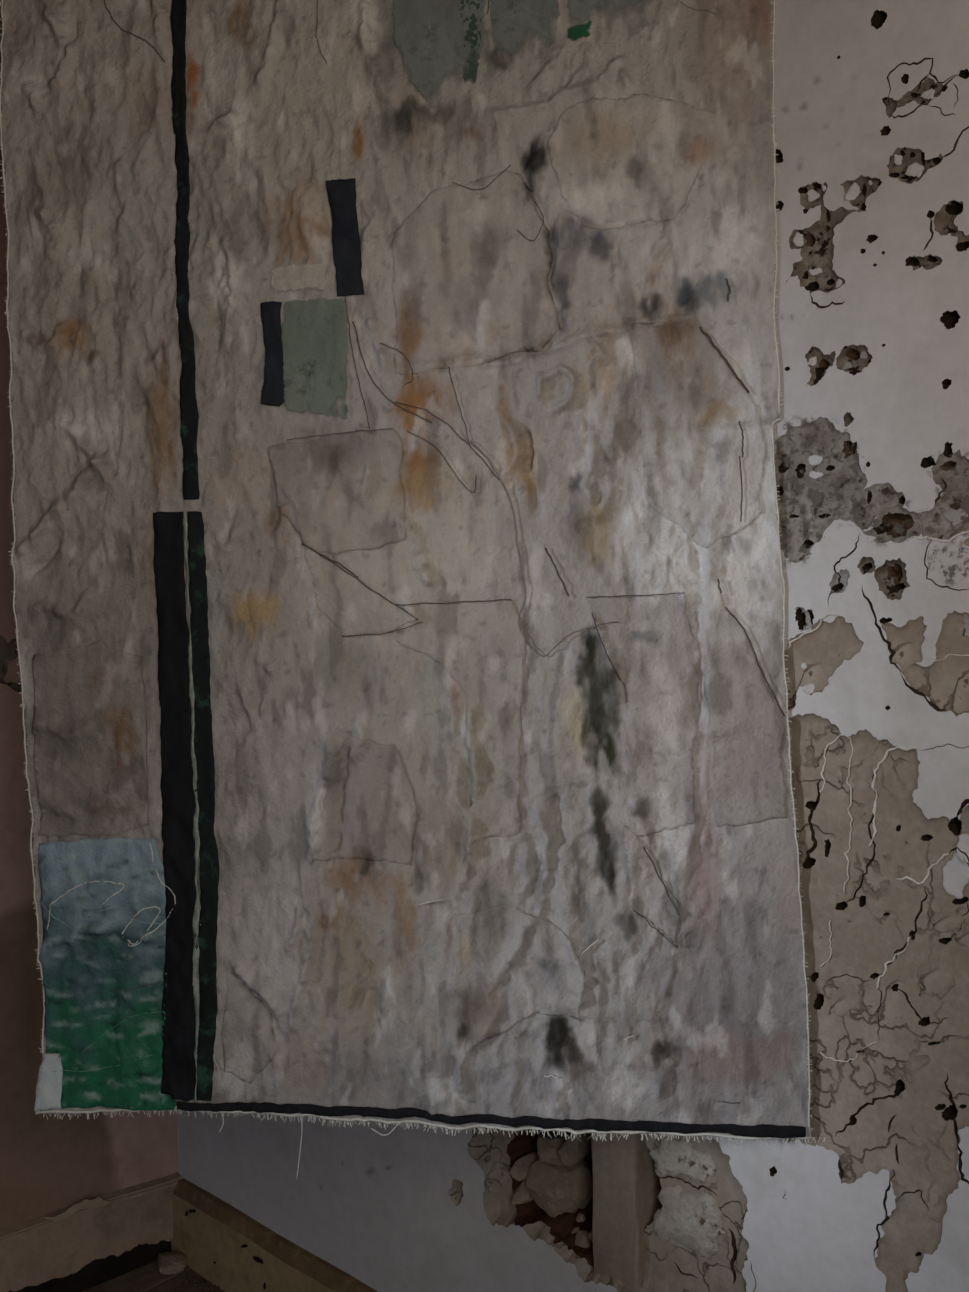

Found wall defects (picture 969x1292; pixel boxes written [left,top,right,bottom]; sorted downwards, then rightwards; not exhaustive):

flaking render [882,58,969,119]
flaking render [786,126,969,309]
flaking render [805,344,873,386]
flaking render [775,412,969,600]
flaking render [0,635,22,693]
crack [828,534,947,712]
crack [957,799,969,816]
flaking render [784,607,969,1292]
flaking render [448,1179,463,1206]
spalling [467,1127,749,1292]